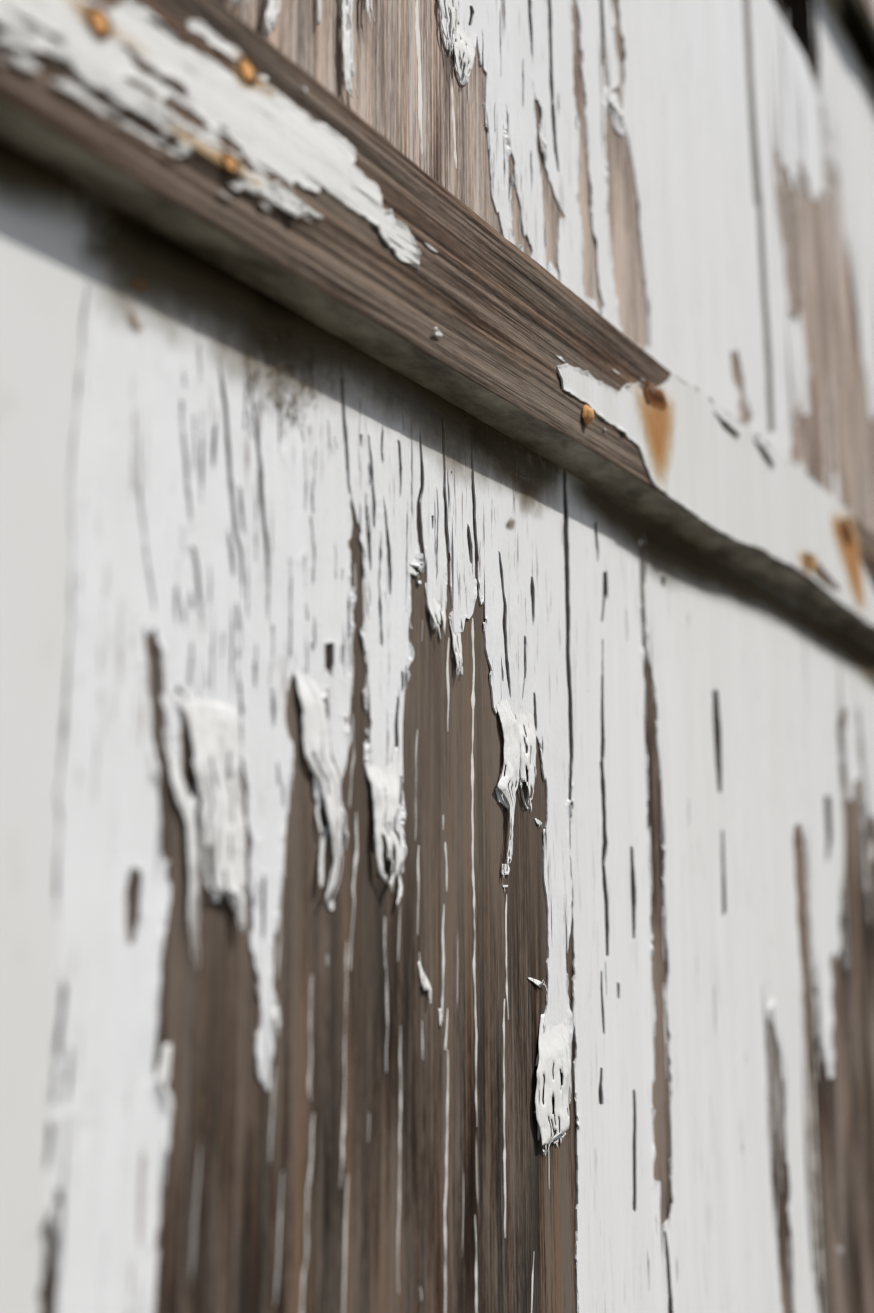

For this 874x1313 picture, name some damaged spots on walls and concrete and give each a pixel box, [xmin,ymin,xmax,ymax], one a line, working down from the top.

rust [74,0,116,39]
rust [173,128,257,180]
rust [236,54,268,90]
peeling [0,0,564,270]
peeling [571,0,650,350]
peeling [555,104,874,626]
peeling [125,865,139,944]
peeling [143,490,578,1313]
peeling [640,553,672,1313]
peeling [793,678,874,1313]
peeling [38,1189,62,1313]
peeling [763,1011,793,1313]